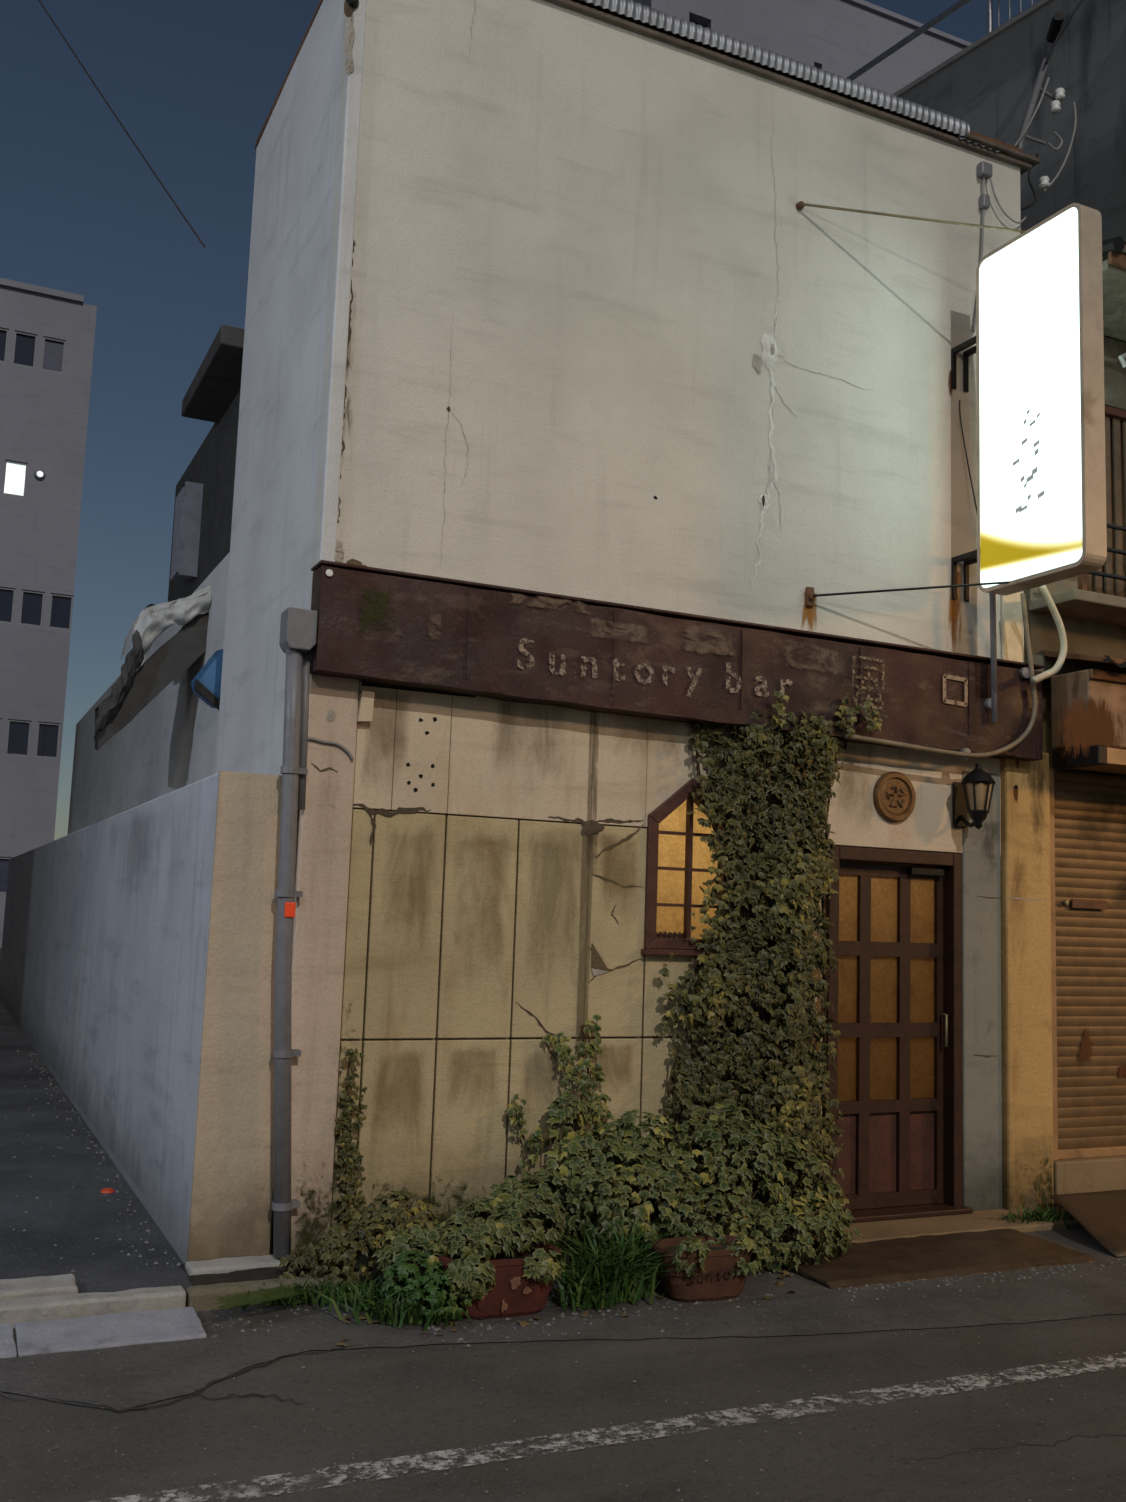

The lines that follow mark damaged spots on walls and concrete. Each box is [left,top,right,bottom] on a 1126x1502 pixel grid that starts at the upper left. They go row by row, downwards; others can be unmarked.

crack [440,317,469,568]
crack [749,85,873,591]
corrosion [802,592,817,629]
corrosion [949,572,961,640]
water stain [577,712,599,1050]
crack [548,816,645,984]